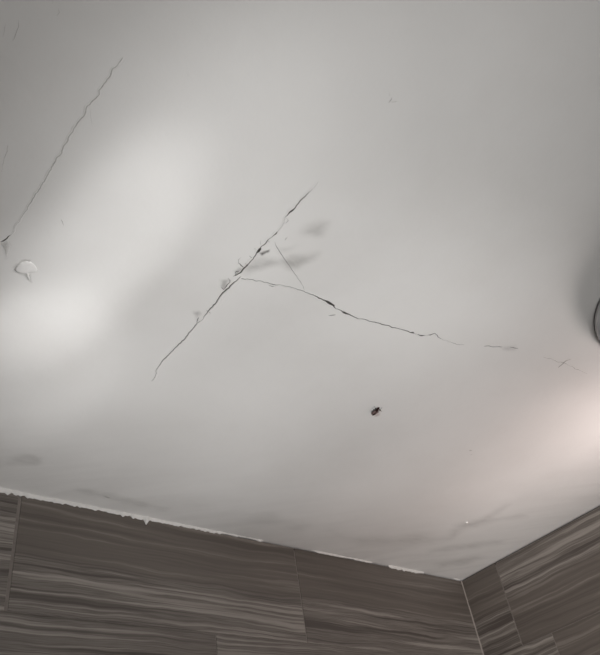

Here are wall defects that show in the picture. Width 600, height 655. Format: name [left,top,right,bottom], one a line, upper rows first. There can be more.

crack [12,57,124,234]
crack [152,182,464,381]